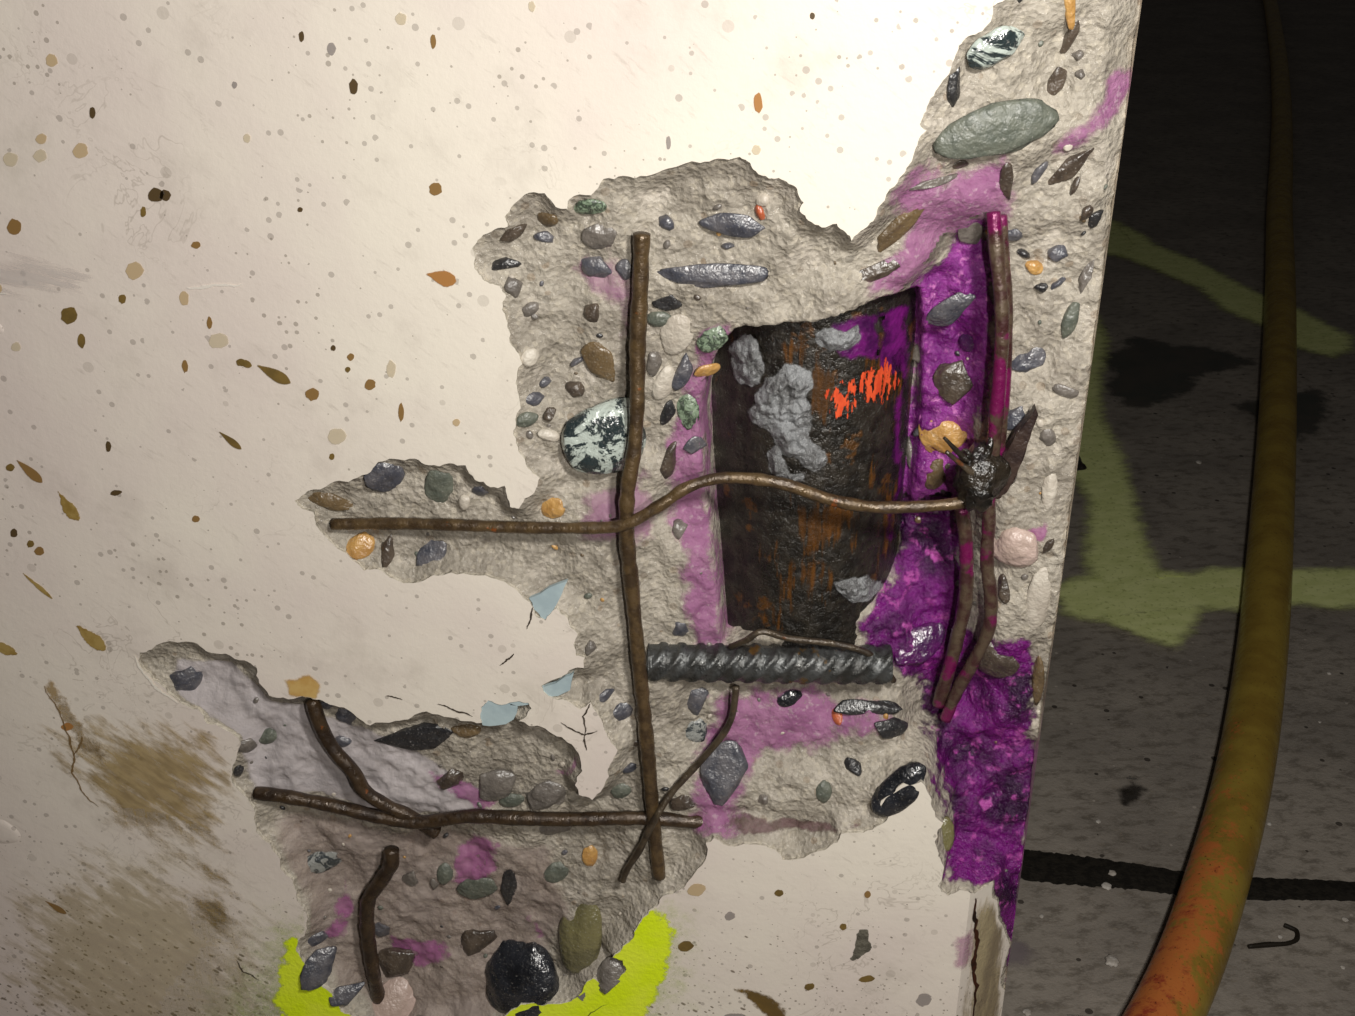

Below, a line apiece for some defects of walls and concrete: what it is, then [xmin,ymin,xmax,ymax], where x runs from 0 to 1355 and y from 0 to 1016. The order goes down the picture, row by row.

rust [785,332,834,421]
spalling [140,0,1141,1016]
rust [763,502,857,630]
crack [44,686,96,805]
crack [971,899,980,1016]